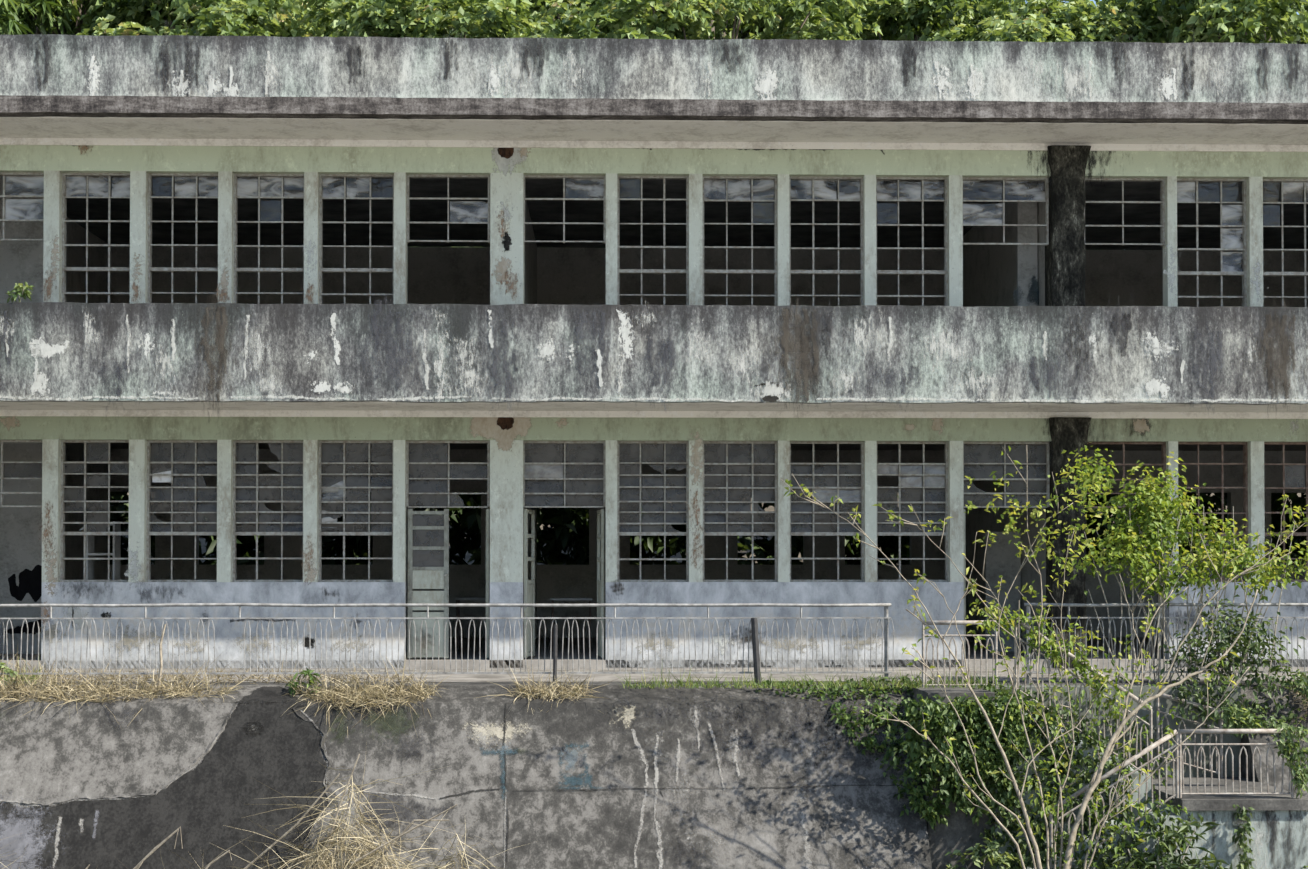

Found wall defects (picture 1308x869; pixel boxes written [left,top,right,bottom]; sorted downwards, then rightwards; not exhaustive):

damp [35,38,53,91]
damp [156,35,208,96]
damp [340,37,367,83]
damp [443,40,458,80]
damp [902,45,926,86]
damp [1183,46,1195,100]
spalling [491,148,530,177]
peeling [0,314,198,401]
spalling [380,309,791,451]
damp [1253,302,1308,405]
damp [609,697,909,869]
damp [0,805,62,869]